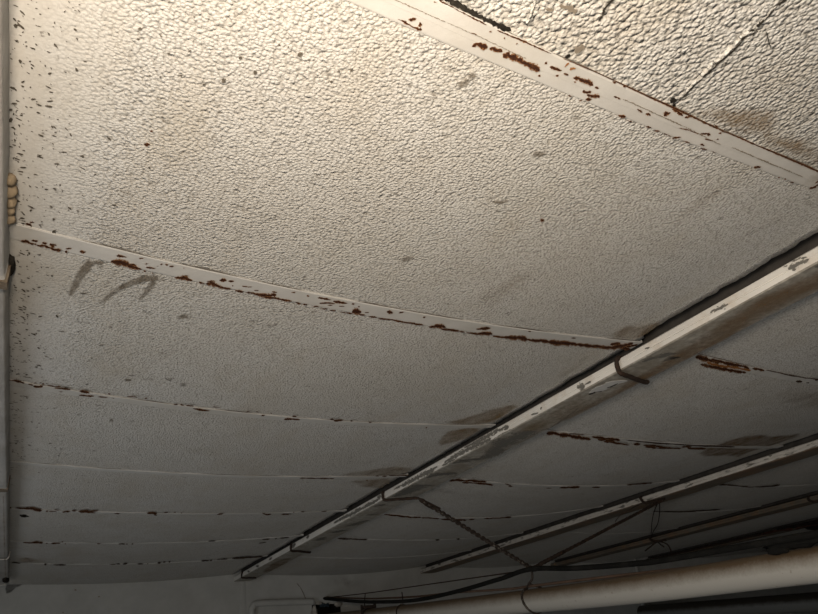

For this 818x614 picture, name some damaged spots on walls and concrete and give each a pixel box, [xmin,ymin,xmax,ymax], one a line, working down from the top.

crack [396,0,526,59]
crack [599,0,614,21]
crack [680,0,786,100]
corrosion [434,0,818,189]
crack [623,99,802,177]
corrosion [22,239,85,254]
corrosion [111,255,638,350]
corrosion [695,355,818,383]
corrosion [546,431,734,450]